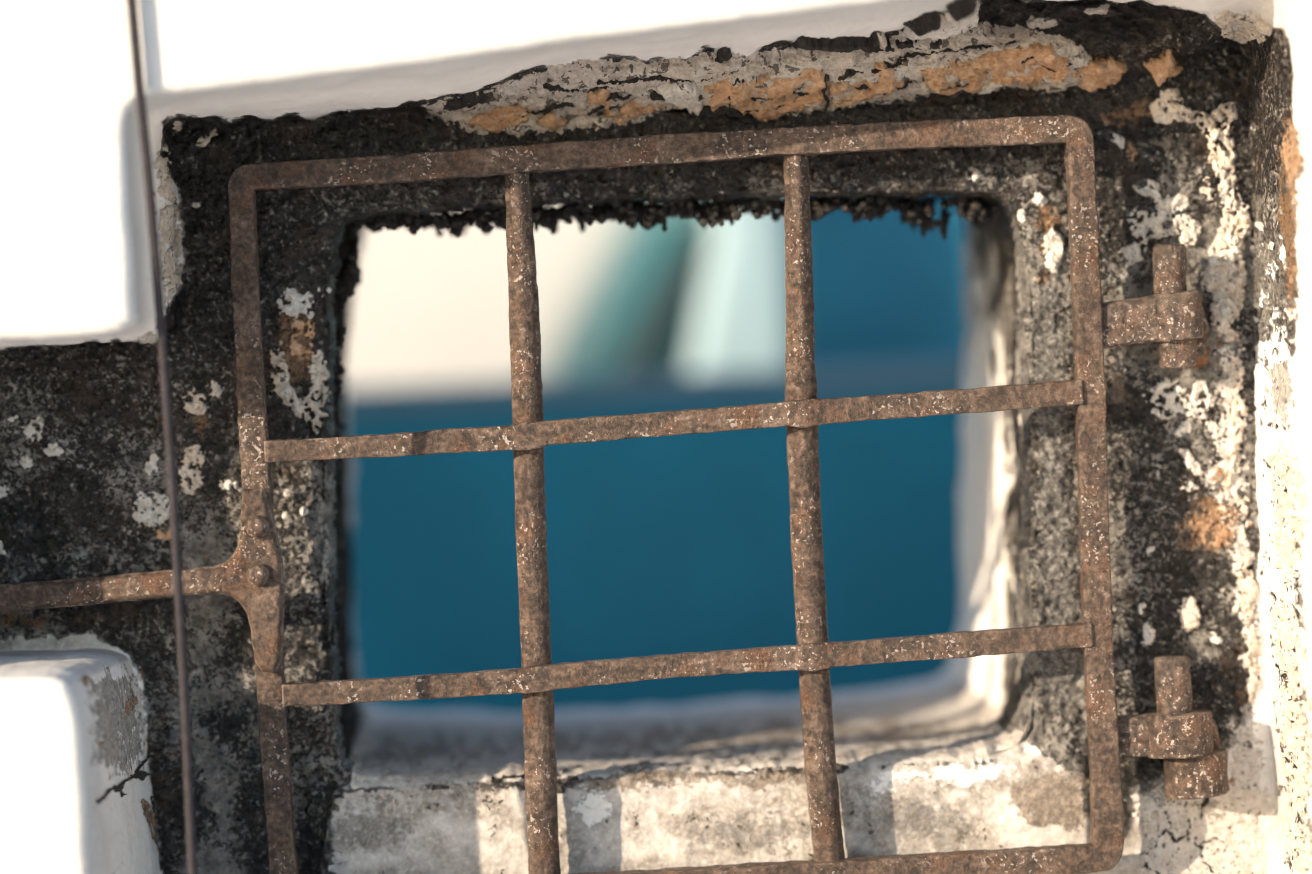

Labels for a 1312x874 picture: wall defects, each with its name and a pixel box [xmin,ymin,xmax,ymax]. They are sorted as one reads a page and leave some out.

spalling [270,285,332,434]
leakage [1021,282,1073,383]
spalling [422,0,1312,874]
leakage [1026,406,1081,626]
spalling [82,664,149,781]
crack [96,756,167,874]
leakage [332,728,524,849]
leakage [555,716,806,793]
leakage [696,811,808,855]
leakage [873,802,969,836]
leakage [1011,772,1089,831]
leakage [1031,648,1085,718]